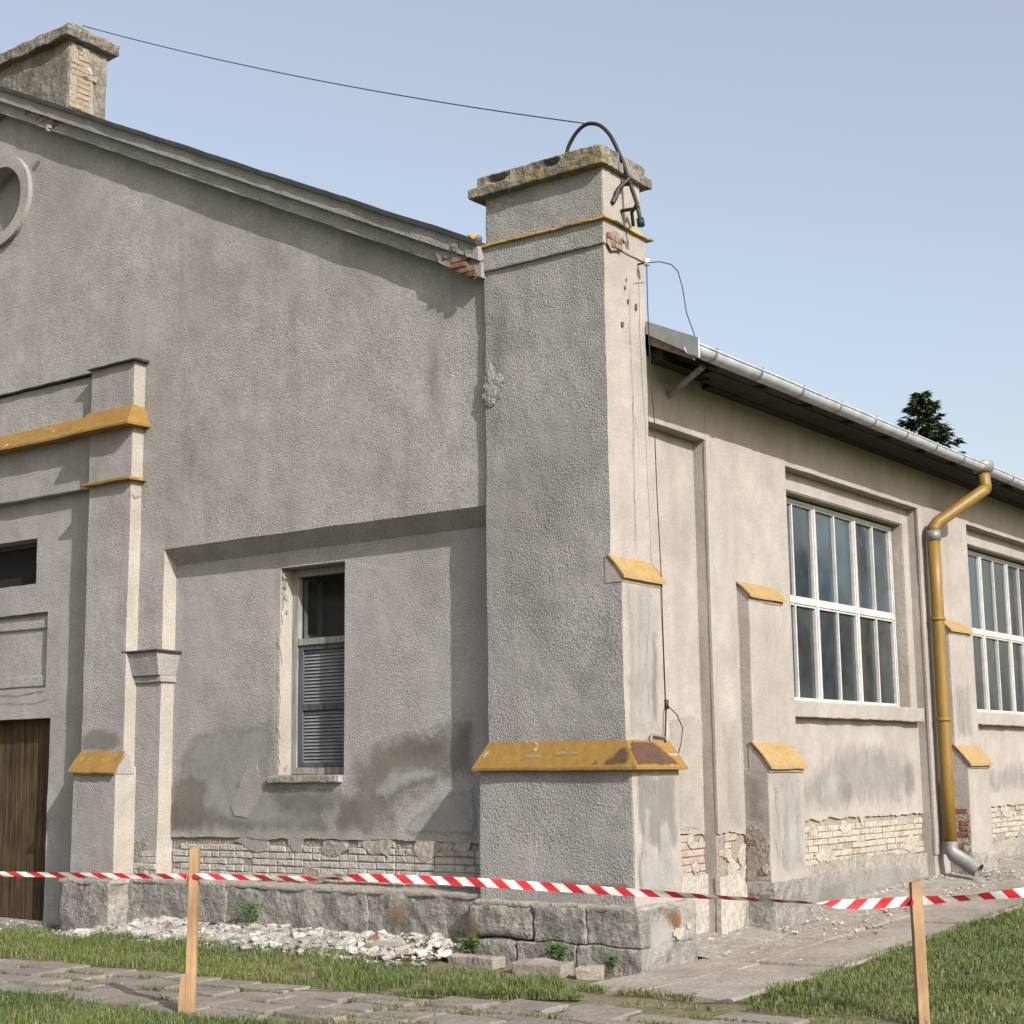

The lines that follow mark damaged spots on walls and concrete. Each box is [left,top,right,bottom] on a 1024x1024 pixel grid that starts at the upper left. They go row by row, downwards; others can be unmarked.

spalling [435,233,482,279]
rust [593,741,677,764]
leakage [174,777,205,824]
spalling [172,837,480,891]
leakage [640,774,676,891]
peeling [670,716,772,881]
spalling [805,816,924,866]
spalling [955,806,972,854]
spalling [991,805,1024,841]
rust [661,906,681,928]